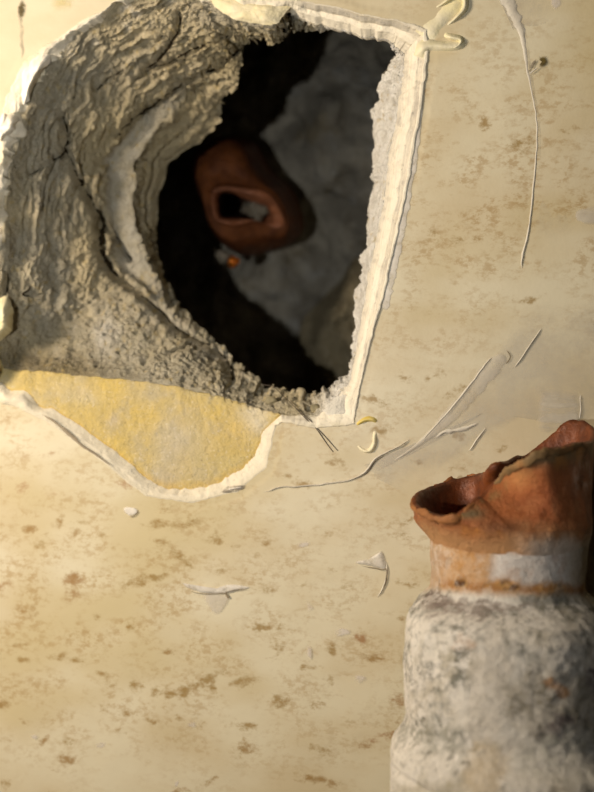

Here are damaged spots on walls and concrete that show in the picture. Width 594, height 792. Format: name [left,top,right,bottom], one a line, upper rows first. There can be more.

spalling [0,0,429,503]
corrosion [467,442,590,484]
corrosion [410,498,474,524]
peeling [356,552,388,596]
peeling [184,583,248,612]